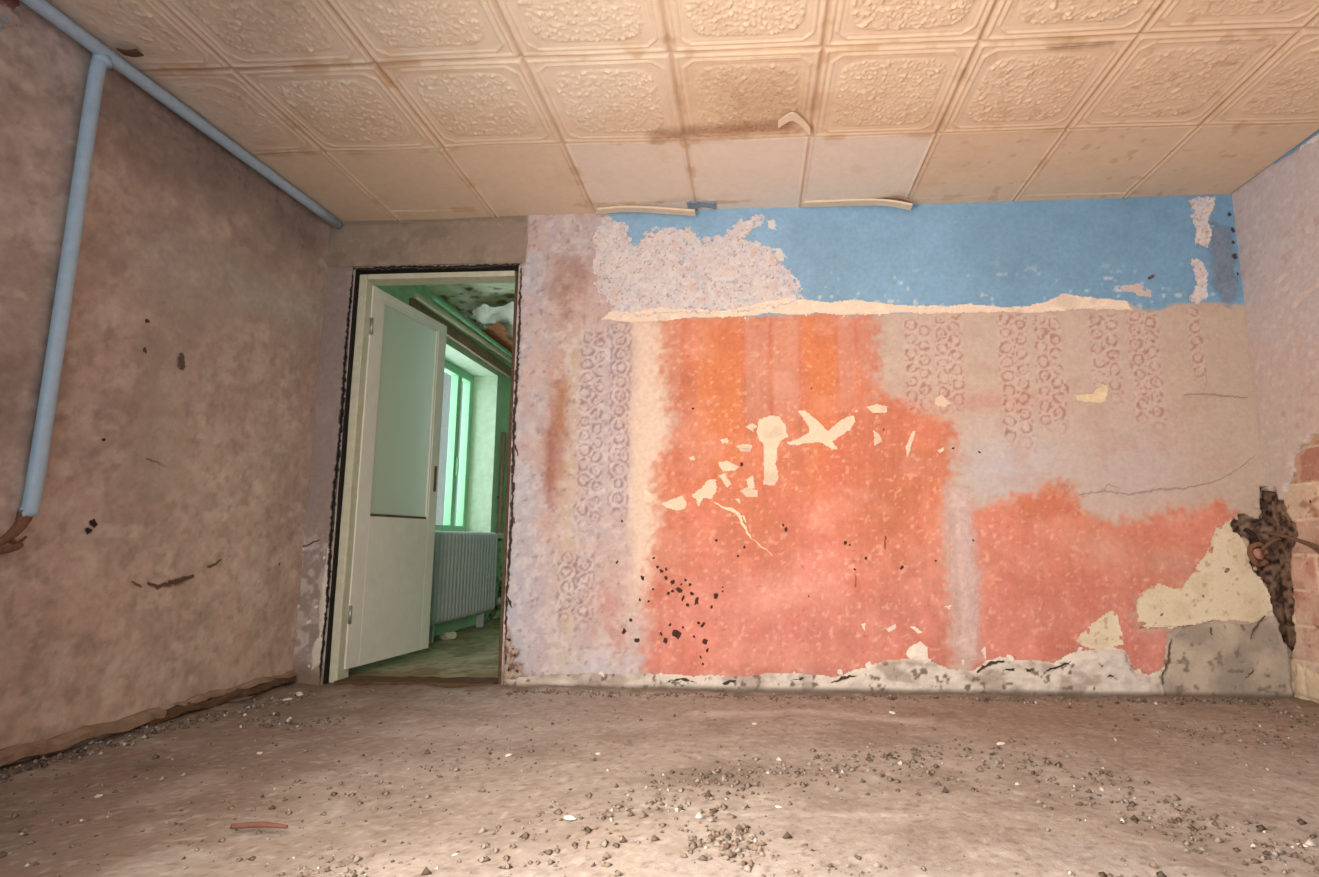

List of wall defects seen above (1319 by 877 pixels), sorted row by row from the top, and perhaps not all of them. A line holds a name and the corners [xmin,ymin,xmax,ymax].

peeling [592,214,1152,323]
peeling [1188,196,1239,305]
peeling [934,395,951,407]
peeling [1064,384,1108,403]
peeling [644,404,888,510]
spalling [503,434,1319,703]